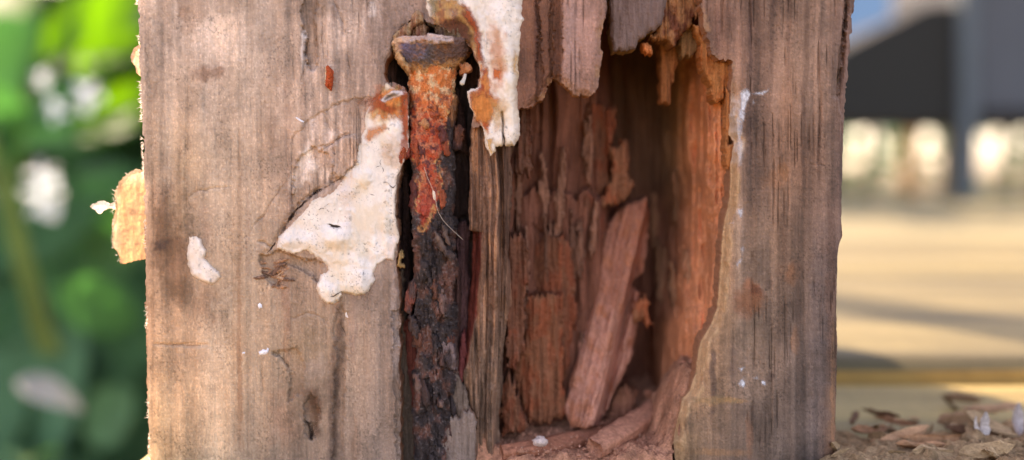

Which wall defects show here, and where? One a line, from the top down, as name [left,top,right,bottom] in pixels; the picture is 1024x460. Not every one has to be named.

peeling [426,0,524,156]
peeling [253,101,409,304]
peeling [187,236,221,285]
rust [433,223,455,262]
rust [404,278,420,340]
rust [433,334,457,371]
rust [413,372,422,393]